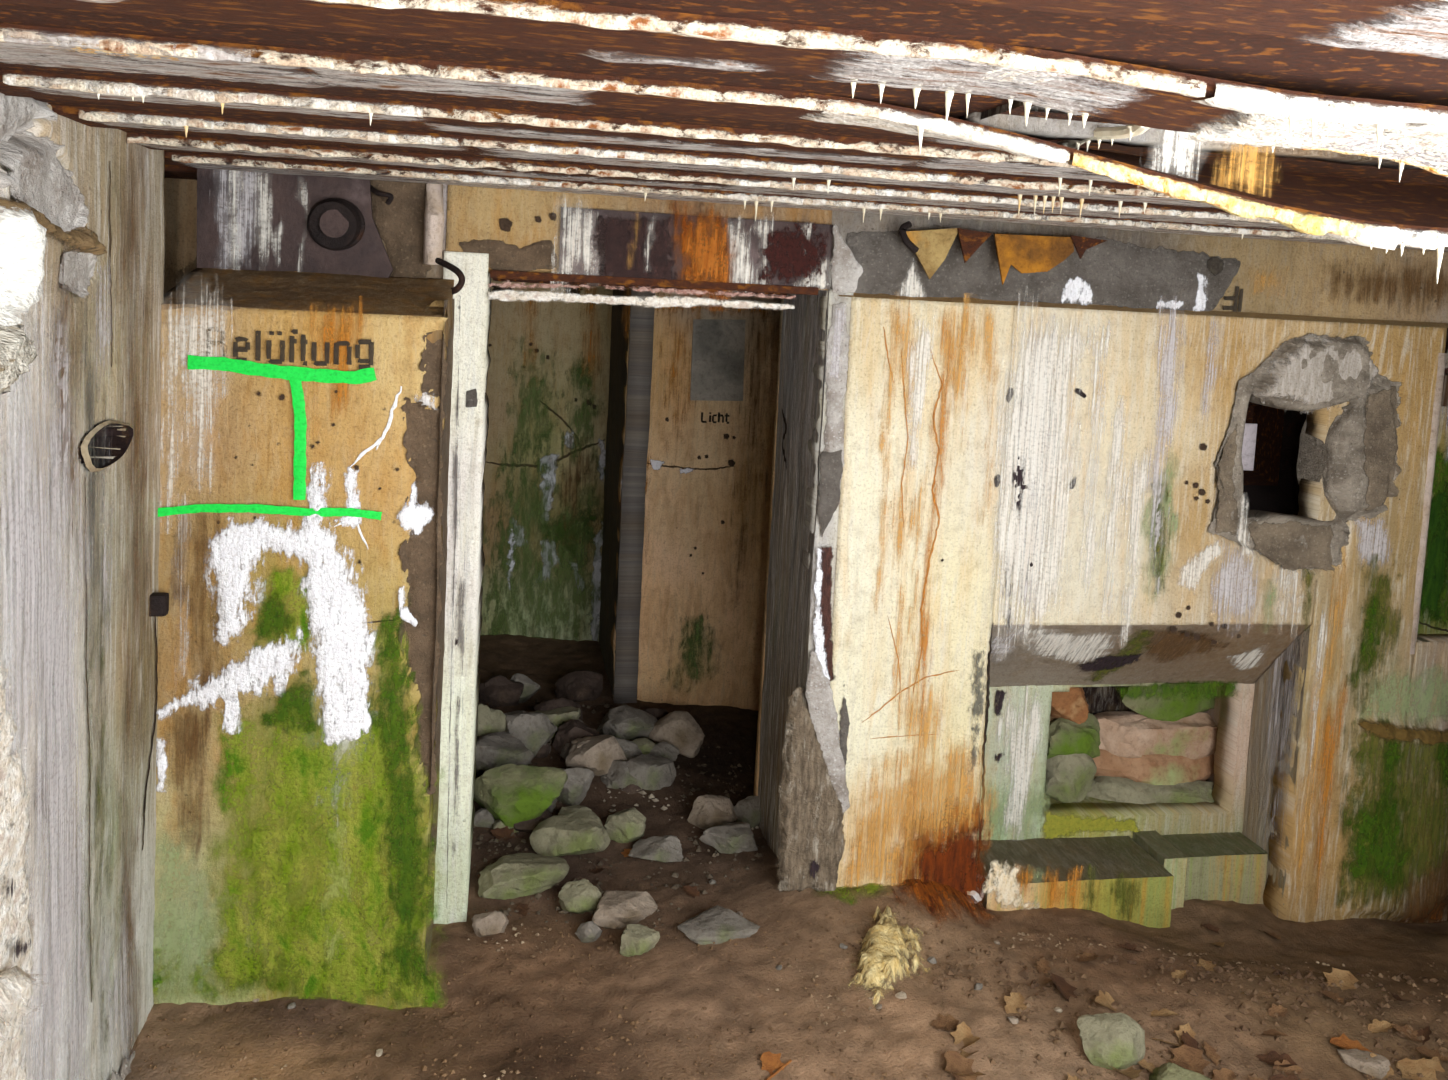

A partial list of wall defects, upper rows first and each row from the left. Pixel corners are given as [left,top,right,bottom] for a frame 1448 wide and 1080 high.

spalling [0,93,109,394]
damp [0,307,113,1080]
damp [156,739,167,792]
damp [157,462,377,763]
corrosion [585,202,778,496]
damp [0,0,1448,641]
corrosion [758,223,828,287]
corrosion [845,293,999,924]
spalling [778,224,1241,892]
damp [983,861,1036,910]
damp [968,301,1313,848]
spalling [1185,334,1402,571]